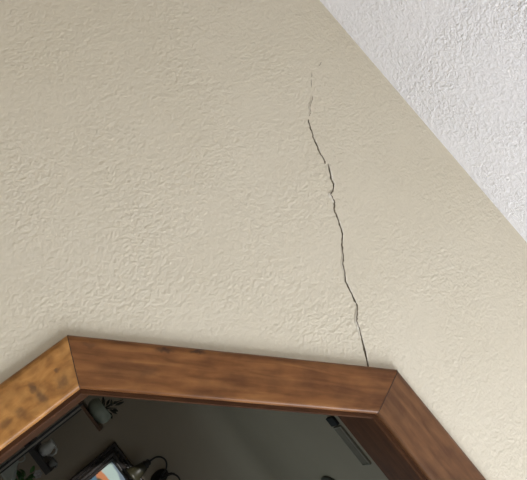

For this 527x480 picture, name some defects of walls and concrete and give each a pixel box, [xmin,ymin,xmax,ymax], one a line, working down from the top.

crack [308,63,369,367]